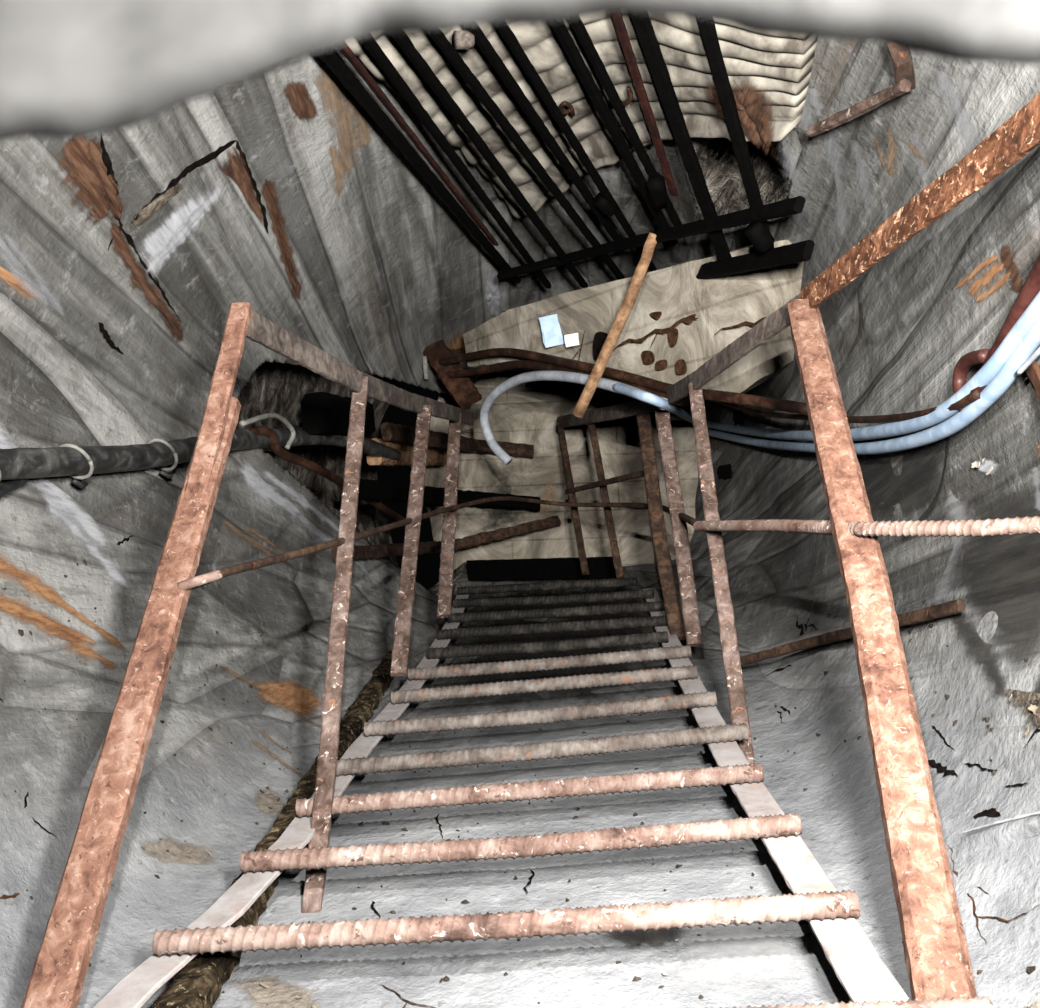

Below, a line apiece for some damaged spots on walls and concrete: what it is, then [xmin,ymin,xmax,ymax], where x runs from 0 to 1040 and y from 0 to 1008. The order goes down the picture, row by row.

rust [285,69,371,195]
crack [100,134,181,321]
rust [262,179,301,299]
rust [0,266,39,298]
rust [956,245,1023,302]
crack [99,322,123,354]
rust [0,558,125,668]
rust [220,666,321,727]
spalling [1002,689,1040,736]